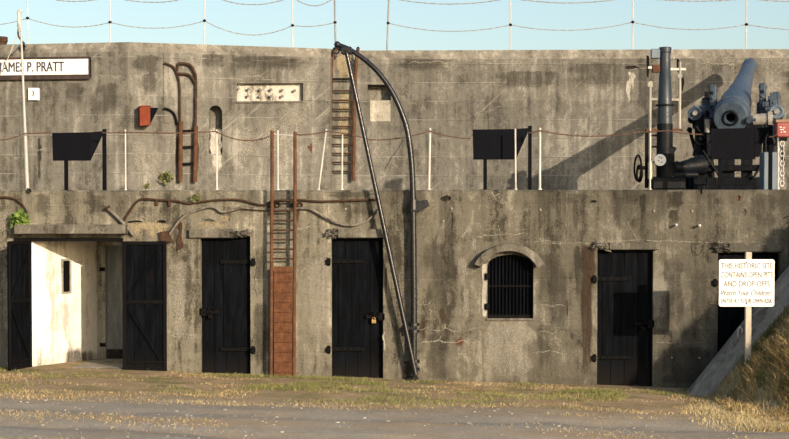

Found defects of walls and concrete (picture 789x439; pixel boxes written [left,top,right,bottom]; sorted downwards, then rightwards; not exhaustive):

leakage [210,130,222,169]
corrosion [582,246,595,366]
crack [422,328,477,343]